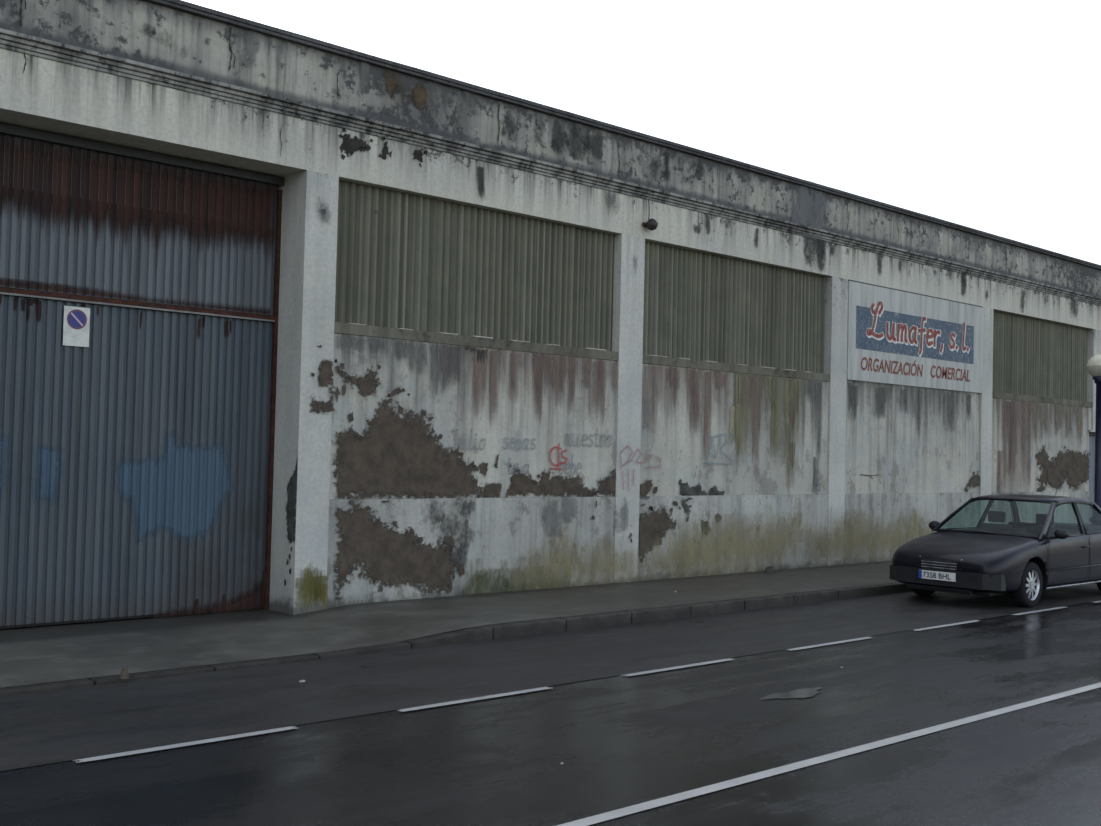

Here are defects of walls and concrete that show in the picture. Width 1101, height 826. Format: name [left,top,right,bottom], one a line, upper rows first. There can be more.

corrosion [0,135,276,247]
peeling [310,359,616,601]
peeling [629,479,725,562]
leakage [766,378,822,486]
leakage [849,382,864,411]
leakage [877,383,971,433]
peeling [1035,444,1091,492]